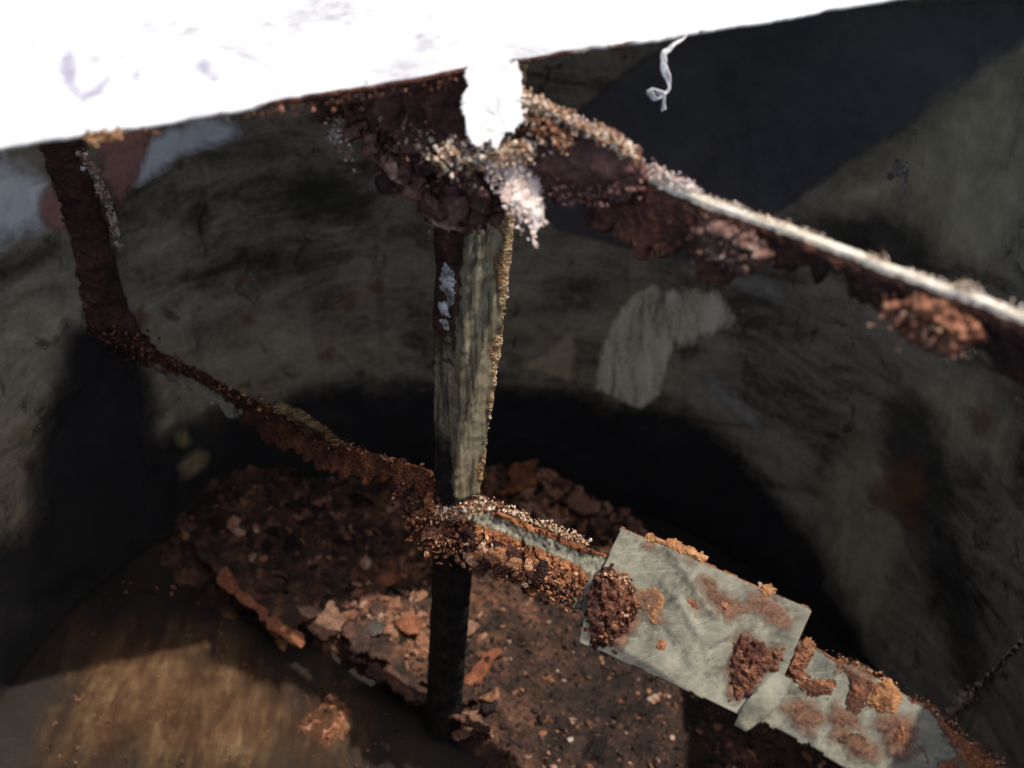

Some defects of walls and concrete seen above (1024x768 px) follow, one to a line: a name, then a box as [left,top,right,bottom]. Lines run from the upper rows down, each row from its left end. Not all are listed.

rust [98,129,149,200]
rust [40,188,66,231]
rust [676,227,774,273]
rust [867,292,981,361]
rust [273,399,349,445]
rust [583,563,664,660]
rust [641,532,918,761]